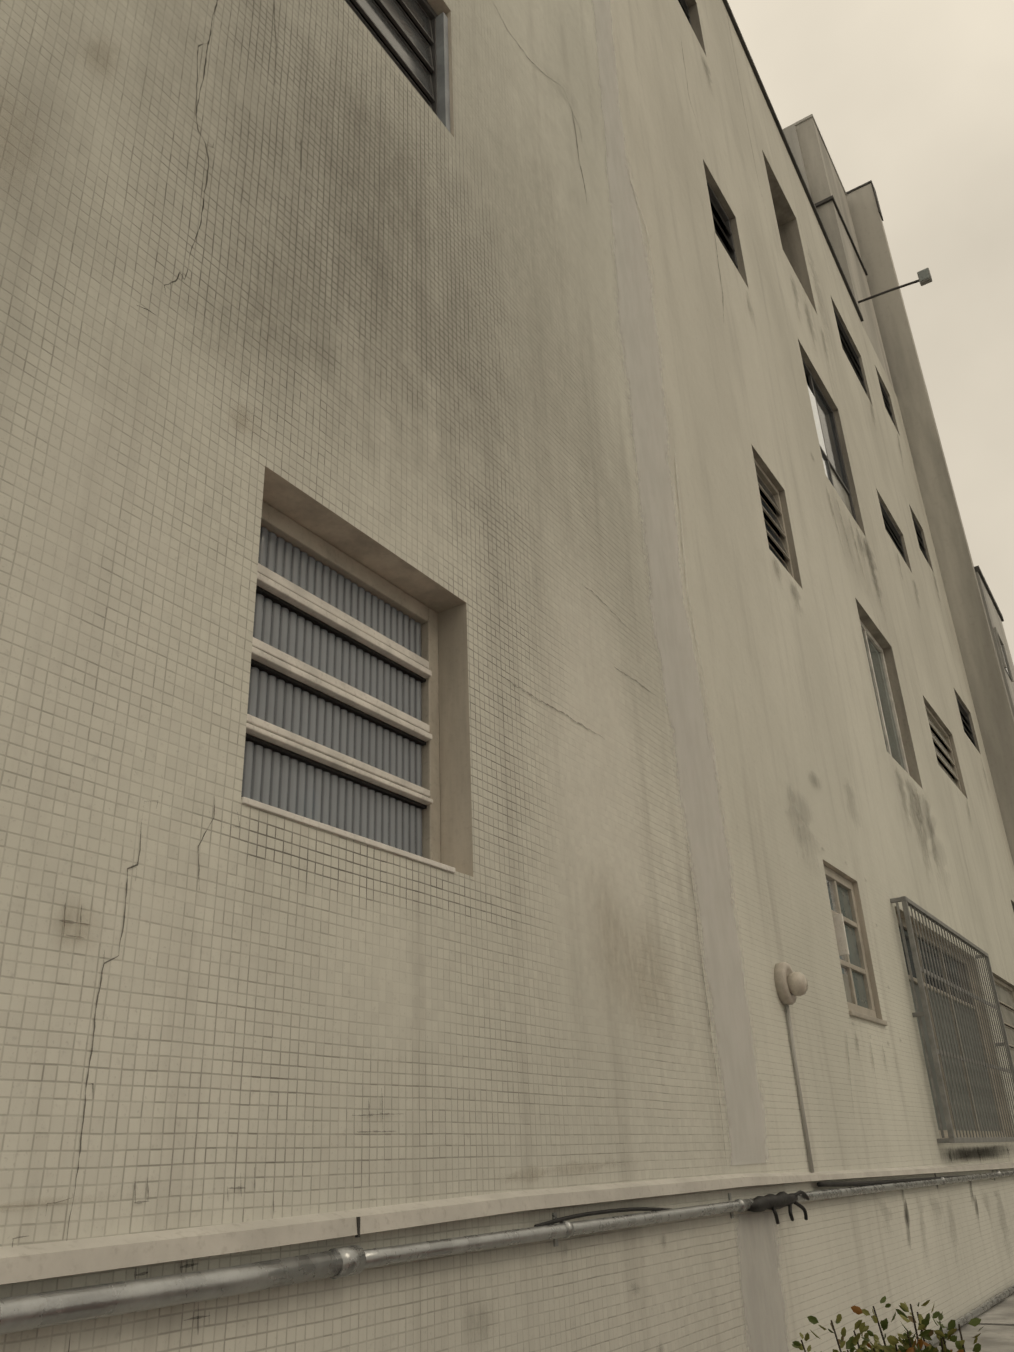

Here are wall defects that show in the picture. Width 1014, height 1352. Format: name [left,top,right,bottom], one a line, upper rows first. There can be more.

crack [137,0,218,314]
crack [494,4,587,201]
crack [46,800,158,1236]